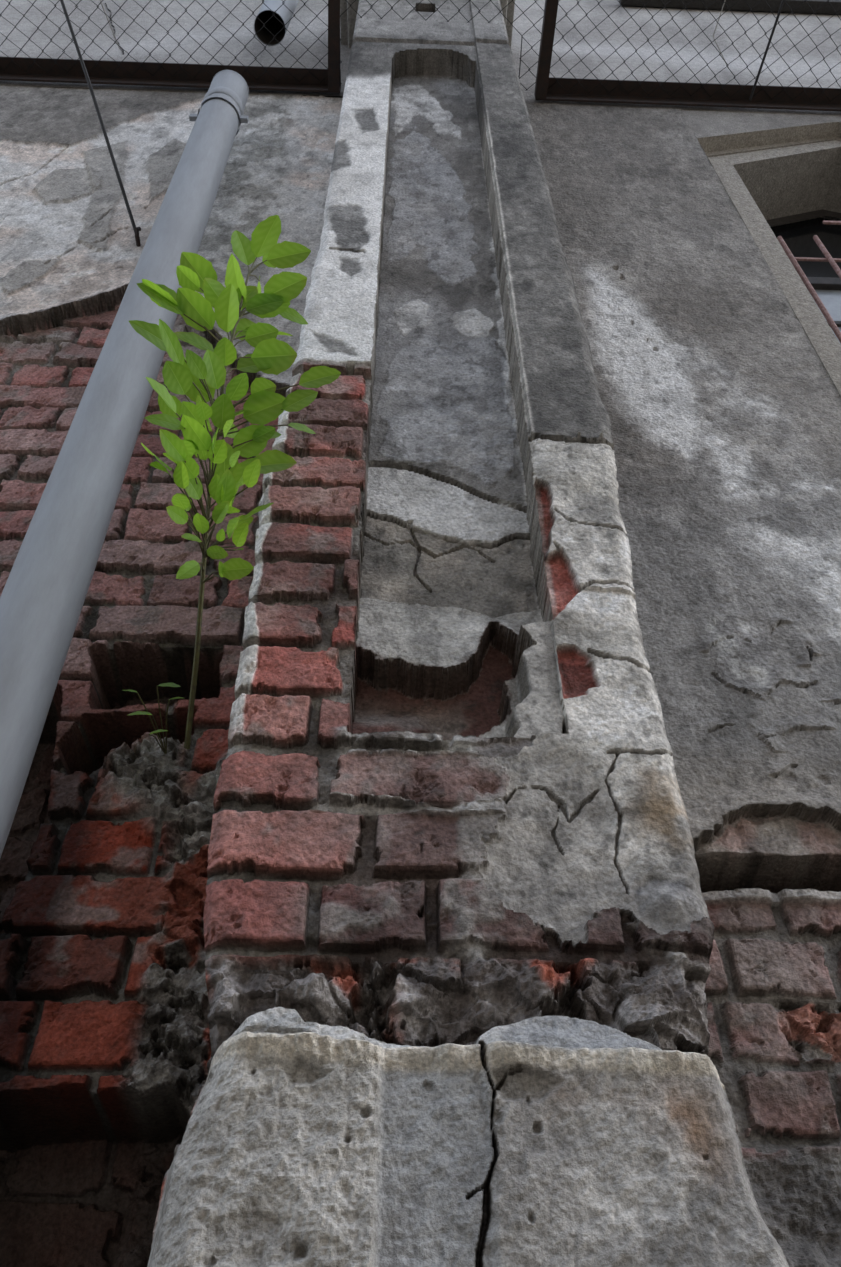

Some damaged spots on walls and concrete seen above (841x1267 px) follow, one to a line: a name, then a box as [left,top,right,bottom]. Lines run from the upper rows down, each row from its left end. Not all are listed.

flaking render [0,96,205,597]
flaking render [197,94,343,352]
peeling [388,89,480,283]
peeling [492,240,505,301]
crack [364,516,497,605]
flaking render [0,287,841,1267]
crack [504,747,672,894]
crack [705,618,841,778]
crack [465,1039,501,1267]